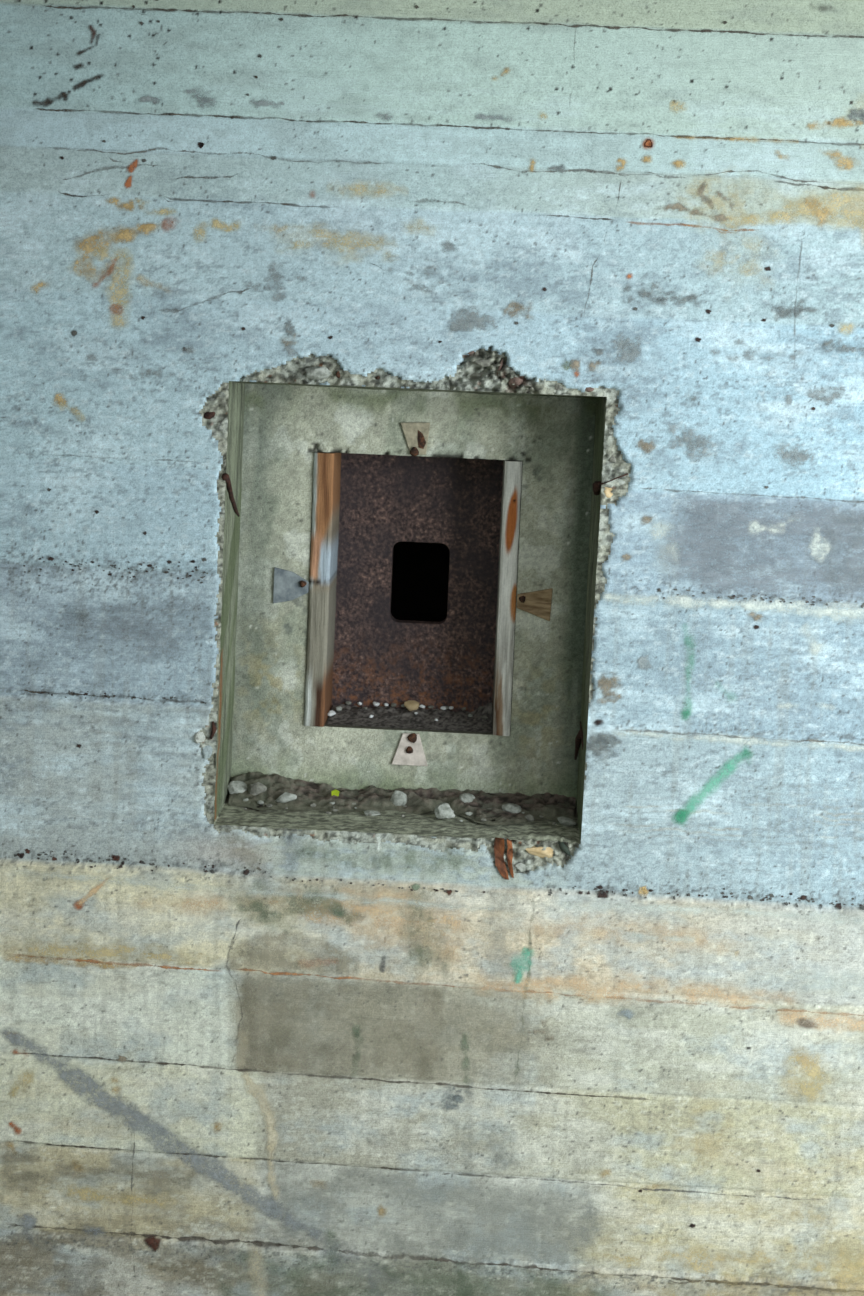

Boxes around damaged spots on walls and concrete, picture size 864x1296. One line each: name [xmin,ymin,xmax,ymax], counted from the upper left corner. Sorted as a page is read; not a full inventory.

rust [74,159,169,325]
spalling [23,321,640,824]
rust [494,838,514,880]